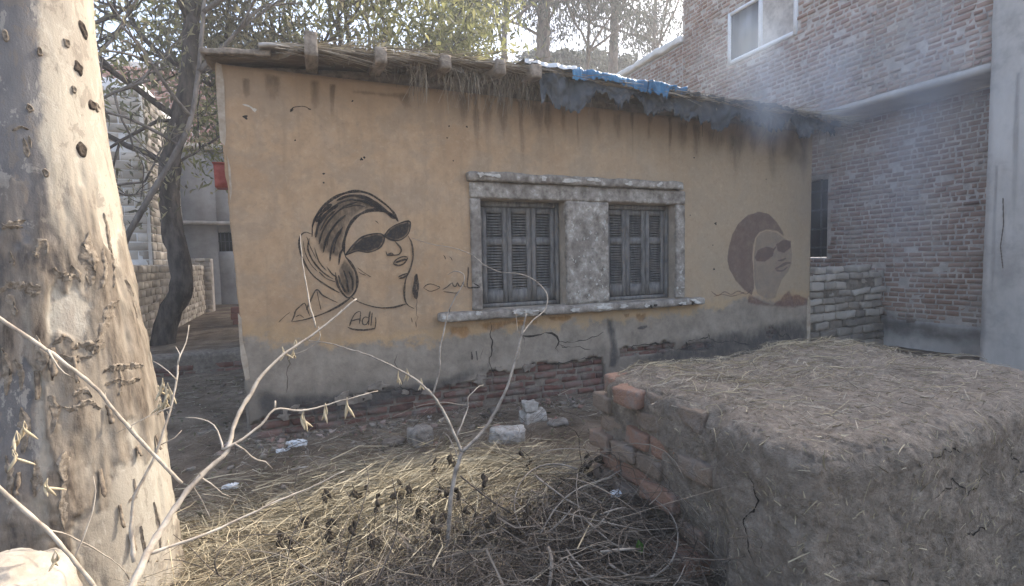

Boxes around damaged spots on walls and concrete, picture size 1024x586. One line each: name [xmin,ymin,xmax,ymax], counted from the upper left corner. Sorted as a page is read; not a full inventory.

peeling [216,62,232,200]
spalling [238,314,604,439]
crack [481,325,495,374]
crack [523,332,603,365]
crack [931,448,984,498]
crack [743,476,760,565]